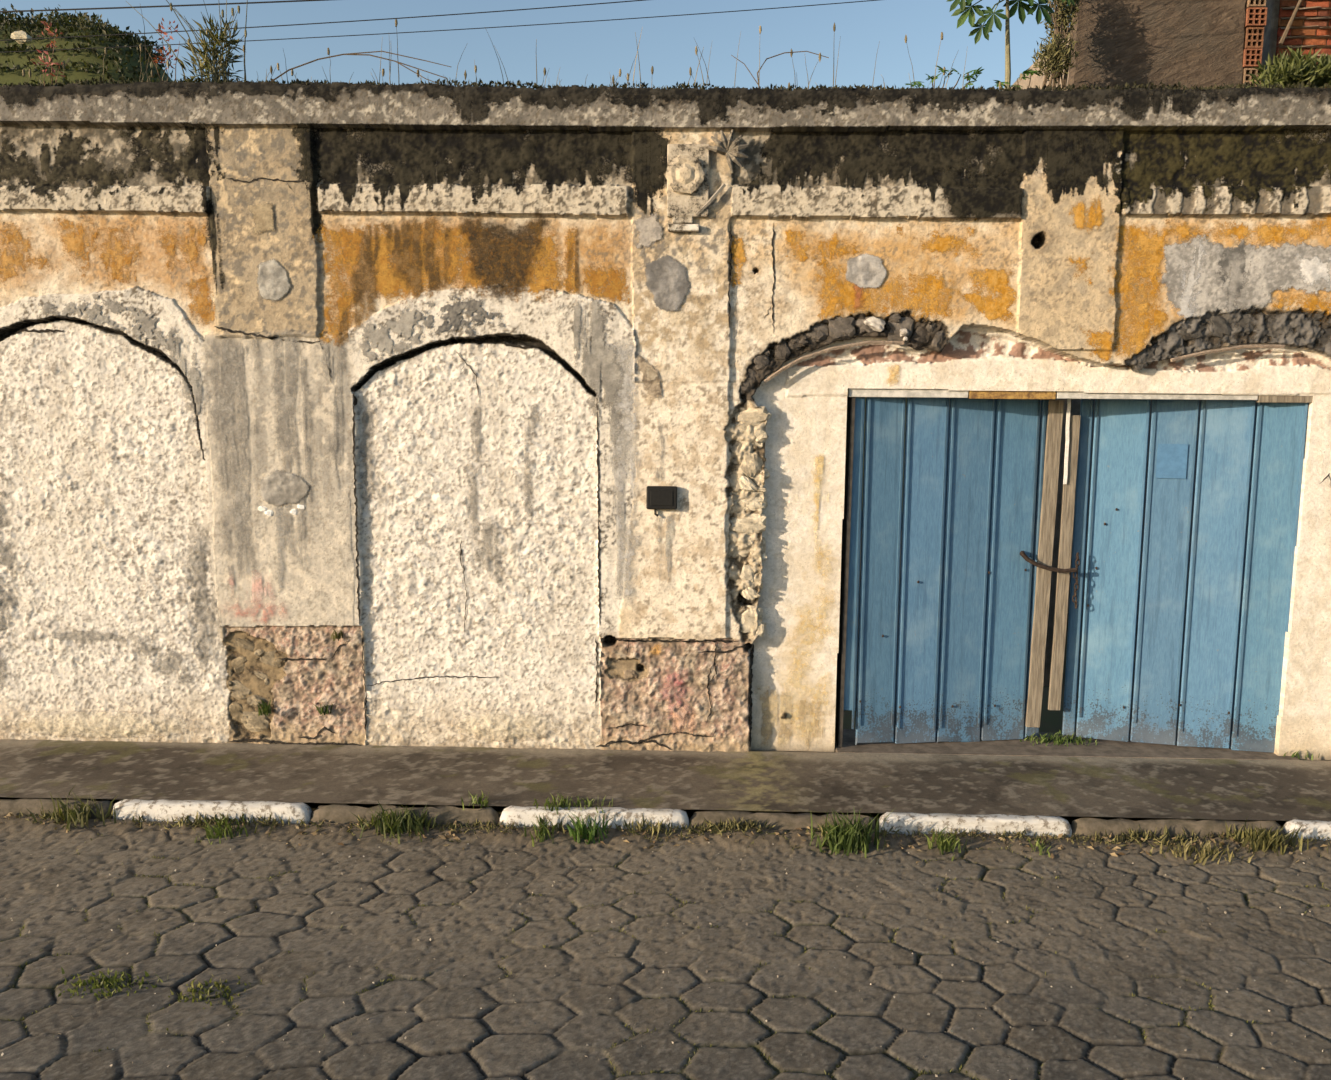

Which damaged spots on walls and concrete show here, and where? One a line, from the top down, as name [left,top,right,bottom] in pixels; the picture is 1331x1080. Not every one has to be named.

water stain [0,81,1331,237]
peeling [1069,257,1092,285]
peeling [1068,195,1105,231]
flaking render [1082,215,1331,372]
water stain [38,218,546,593]
flaking render [724,218,1017,650]
water stain [0,478,18,631]
water stain [30,630,191,682]
water stain [187,536,226,667]
flaking render [223,631,287,741]
crack [214,326,754,751]